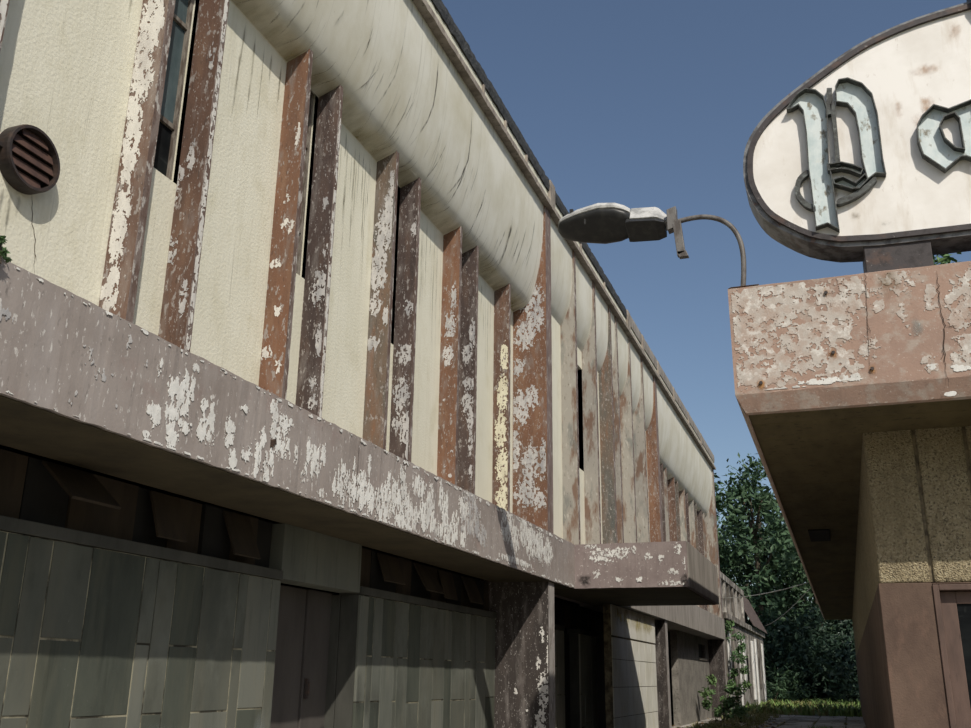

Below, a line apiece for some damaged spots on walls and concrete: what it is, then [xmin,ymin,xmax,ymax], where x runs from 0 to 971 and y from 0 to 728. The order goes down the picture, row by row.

peeling [0,0,8,41]
peeling [83,0,574,587]
peeling [731,268,971,391]
crack [936,275,957,388]
peeling [584,542,686,586]
peeling [526,627,548,728]